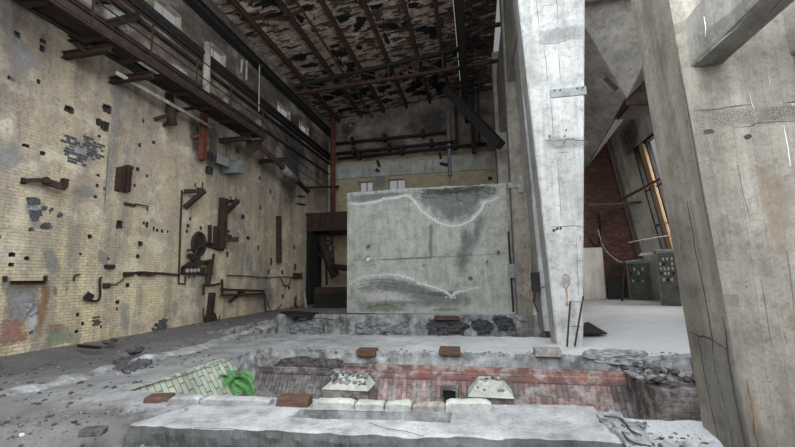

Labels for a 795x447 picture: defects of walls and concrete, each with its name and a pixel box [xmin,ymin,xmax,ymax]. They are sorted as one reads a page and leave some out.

spalling [60,103,112,167]
crack [709,101,795,127]
spalling [25,197,63,232]
leakage [348,176,499,265]
crack [678,62,759,447]
spalling [207,314,551,338]